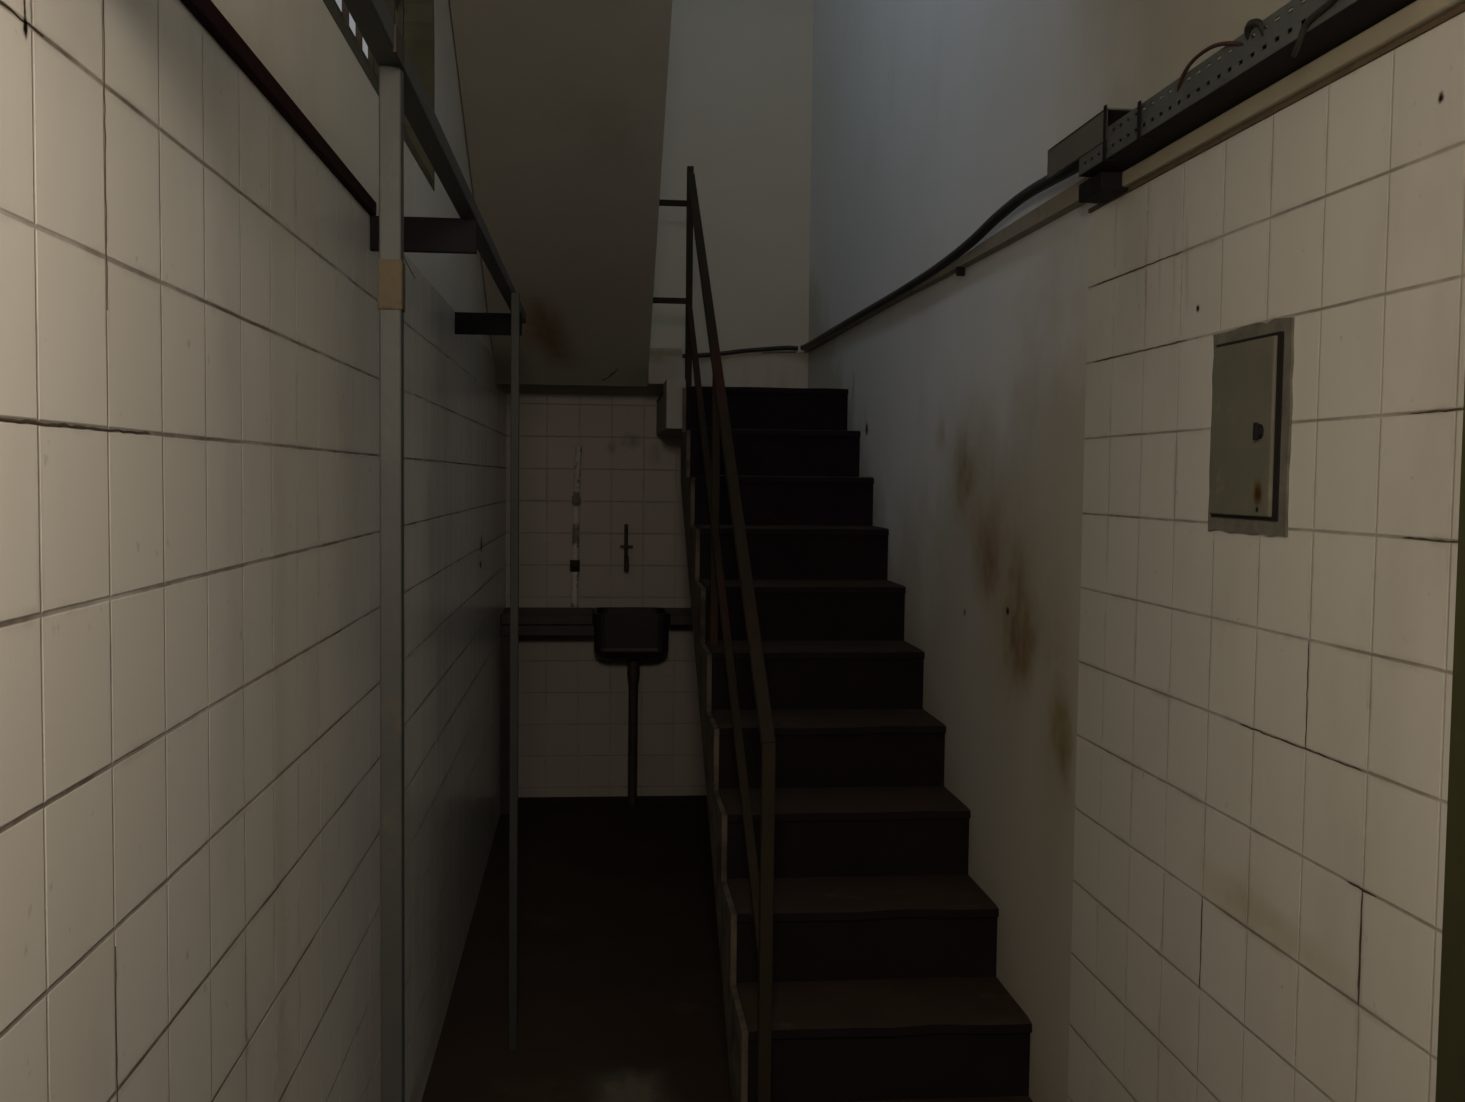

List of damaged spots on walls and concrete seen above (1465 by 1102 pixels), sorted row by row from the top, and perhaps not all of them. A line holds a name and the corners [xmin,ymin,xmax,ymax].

crack [0,0,44,37]